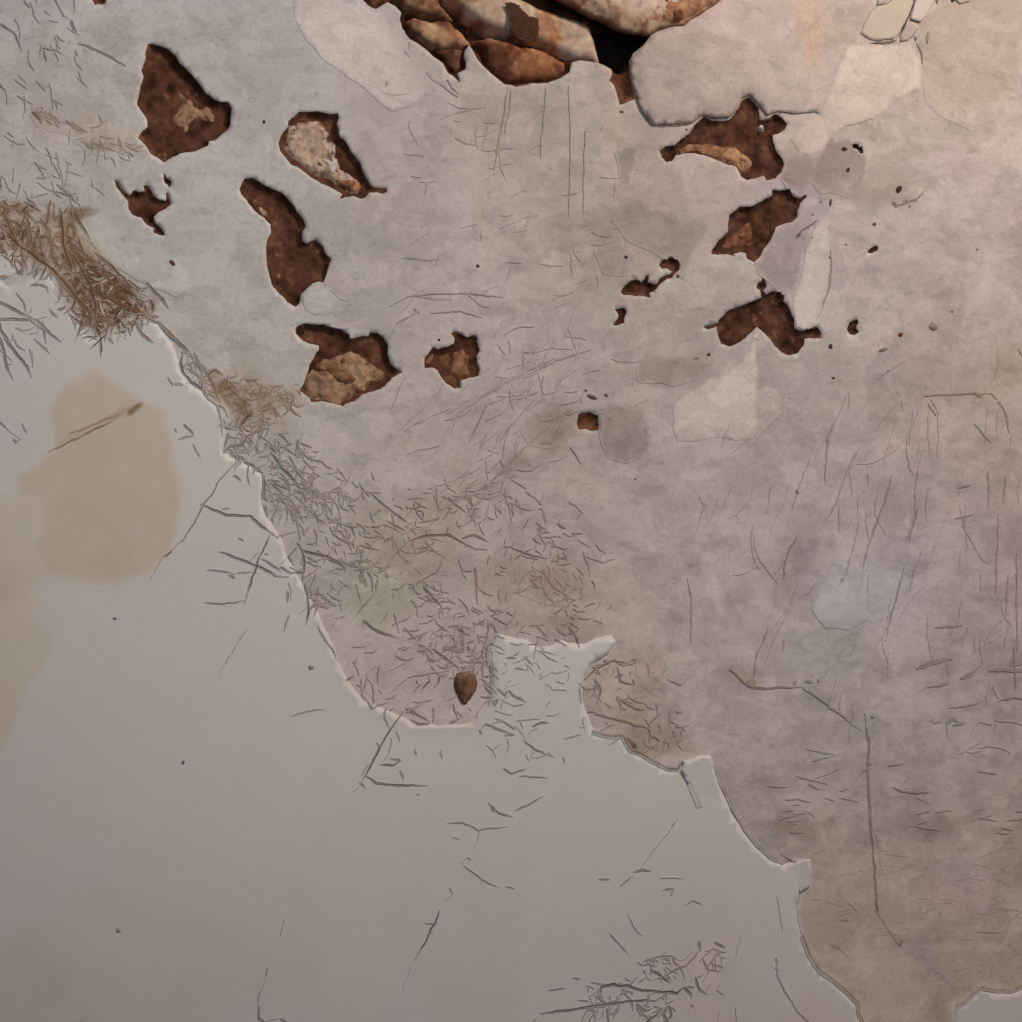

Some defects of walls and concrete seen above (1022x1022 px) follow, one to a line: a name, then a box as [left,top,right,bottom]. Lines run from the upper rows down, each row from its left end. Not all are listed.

spalling [294,0,650,113]
spalling [73,44,231,297]
spalling [279,111,387,199]
peeling [612,0,1022,442]
spalling [239,178,402,406]
crack [0,336,32,379]
damp [0,364,188,762]
peeling [0,250,1022,1022]
damp [0,917,118,1022]
crack [531,914,742,1022]
crack [775,957,810,1022]